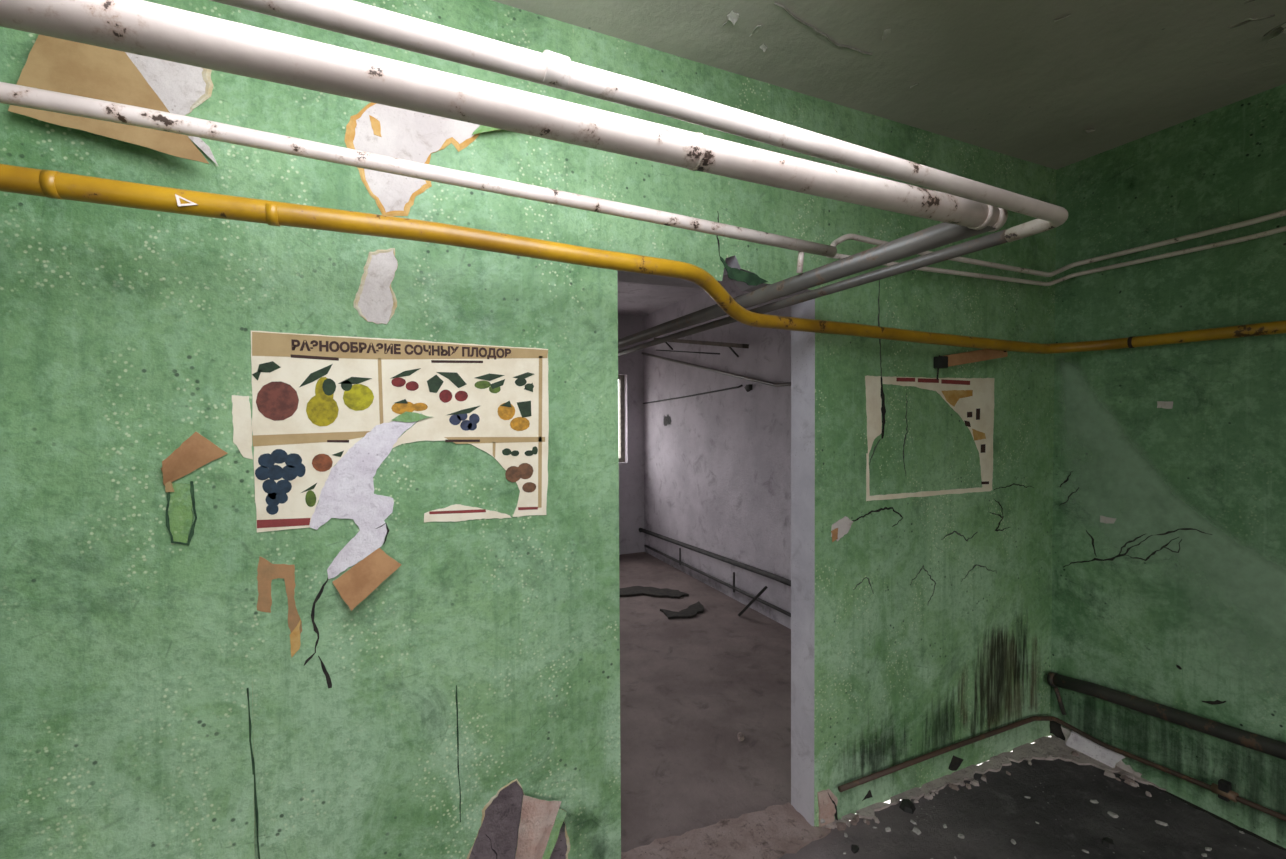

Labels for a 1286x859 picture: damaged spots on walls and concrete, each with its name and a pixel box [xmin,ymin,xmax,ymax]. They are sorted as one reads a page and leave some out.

crack [304,578,332,688]
water stain [980,635,1025,723]
flaking render [466,779,571,859]